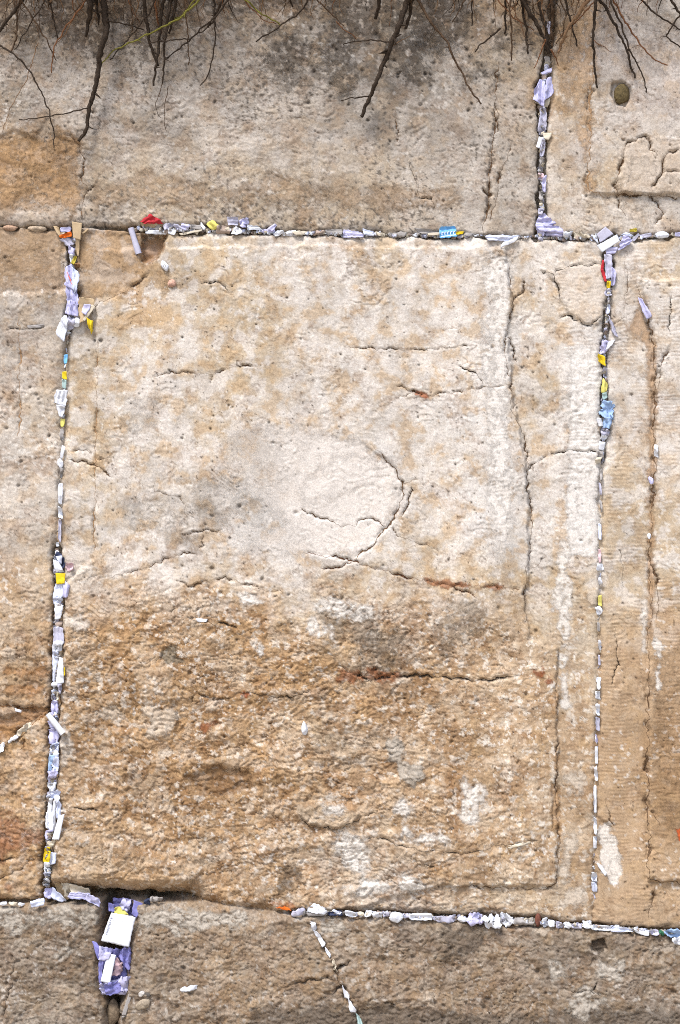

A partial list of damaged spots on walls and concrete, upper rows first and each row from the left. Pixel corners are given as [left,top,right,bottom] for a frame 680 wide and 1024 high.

crack [482,61,511,235]
crack [584,59,678,224]
crack [297,248,679,919]